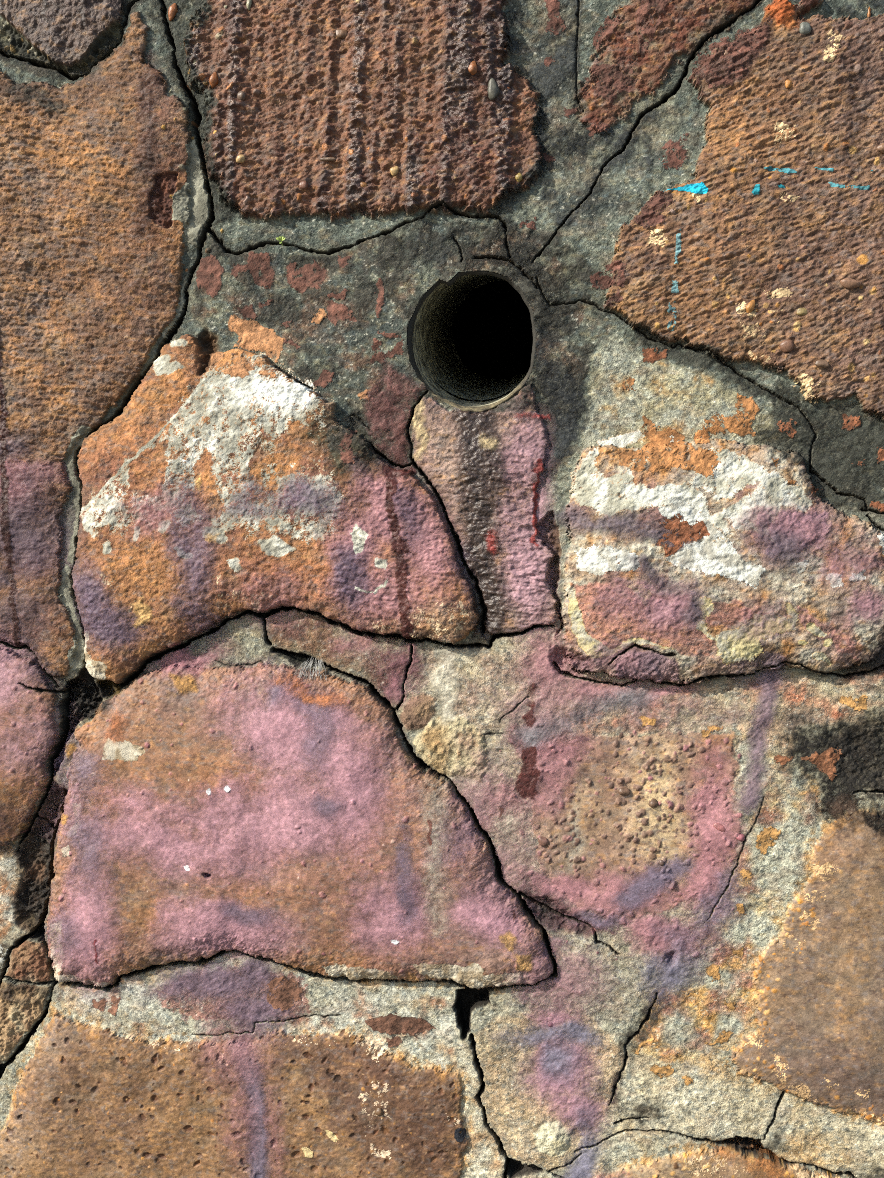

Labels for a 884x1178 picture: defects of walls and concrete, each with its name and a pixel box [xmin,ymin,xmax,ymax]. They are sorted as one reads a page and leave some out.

crack [0,0,884,680]
crack [0,392,620,1079]
crack [552,644,884,688]
crack [708,797,764,920]
crack [853,788,884,796]
crack [469,1033,507,1178]
crack [544,992,856,1178]